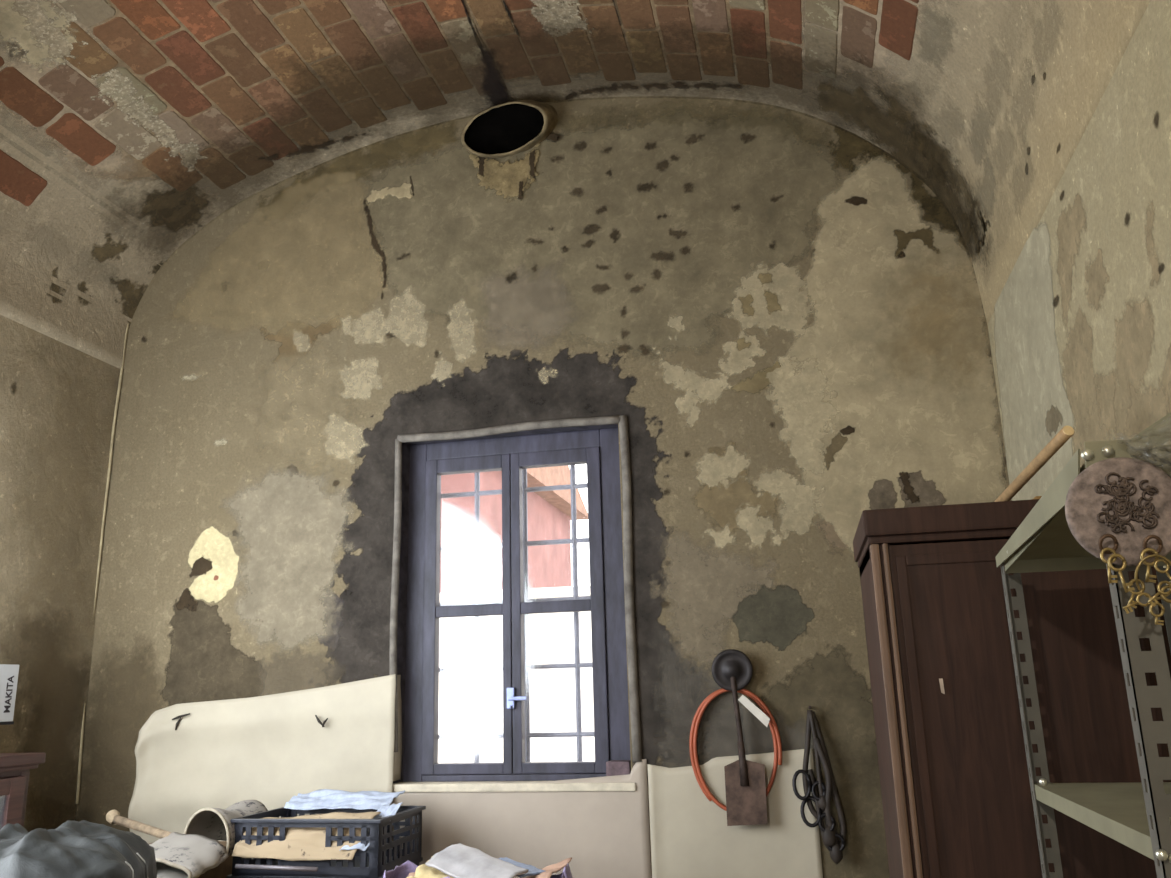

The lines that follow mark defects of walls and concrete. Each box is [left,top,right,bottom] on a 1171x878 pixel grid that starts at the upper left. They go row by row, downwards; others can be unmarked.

water stain [46,268,89,305]
water stain [92,233,127,262]
water stain [110,278,147,328]
water stain [120,28,984,275]
spalling [260,108,1005,552]
water stain [18,348,890,878]